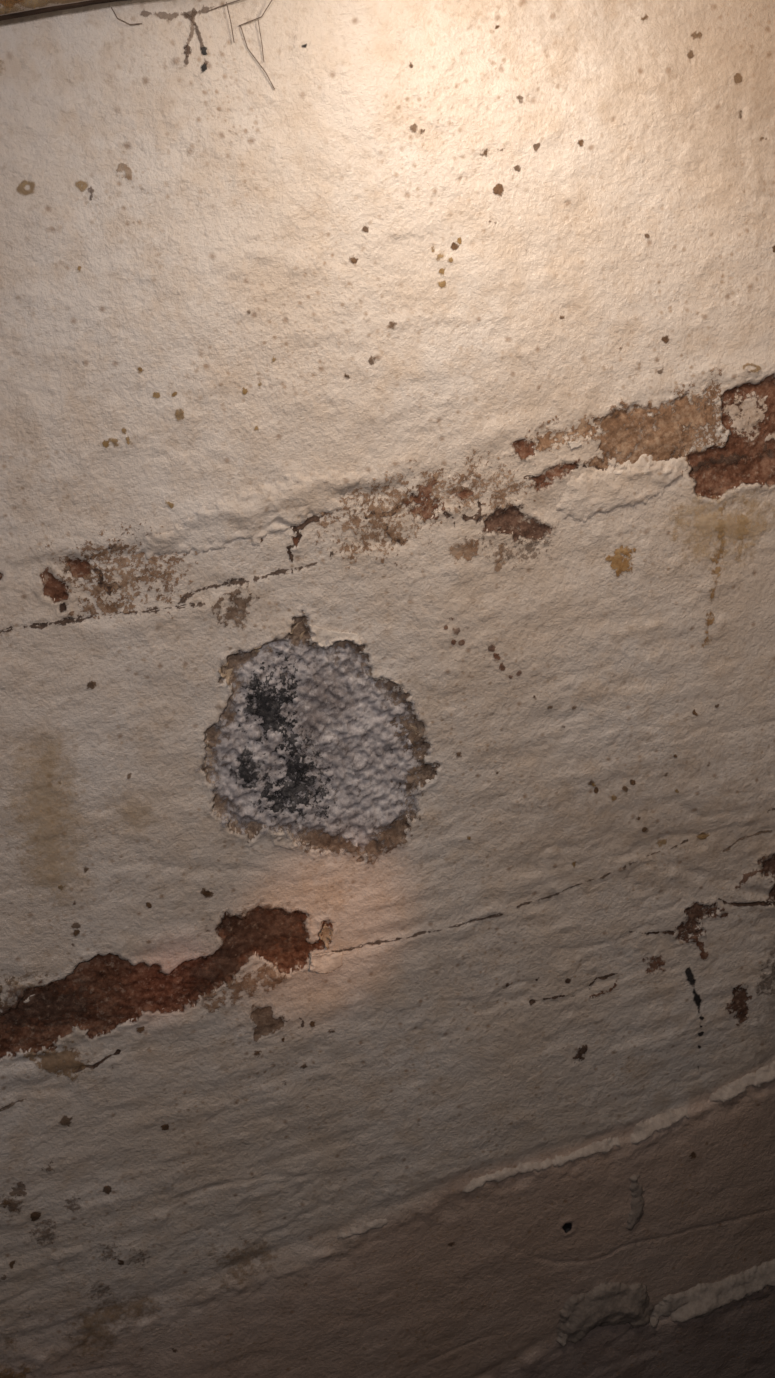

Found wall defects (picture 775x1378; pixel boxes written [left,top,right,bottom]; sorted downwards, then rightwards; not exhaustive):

spalling [286,368,775,577]
peeling [34,522,198,625]
crack [0,551,335,633]
crack [332,839,688,952]
crack [723,830,772,852]
spalling [0,903,343,1081]